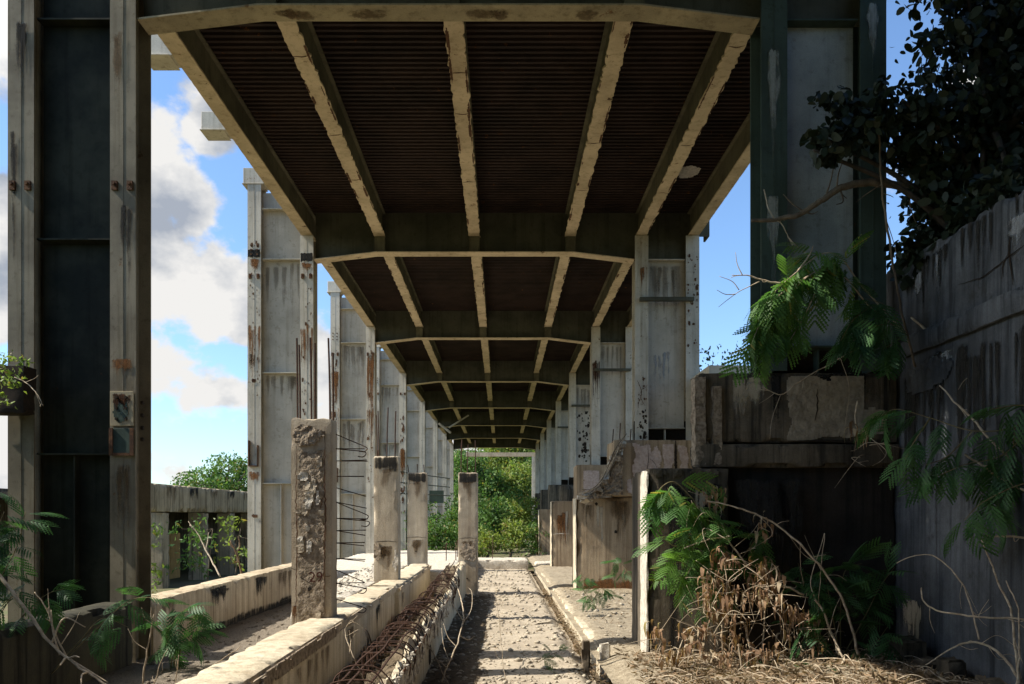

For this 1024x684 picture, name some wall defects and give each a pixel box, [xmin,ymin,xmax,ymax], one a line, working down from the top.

damp [769,49,779,121]
peeling [649,165,701,229]
corrosion [248,325,260,382]
spalling [260,288,337,684]
flaking render [577,411,599,491]
spalling [612,376,723,494]
crack [788,389,880,443]
damp [198,571,291,638]